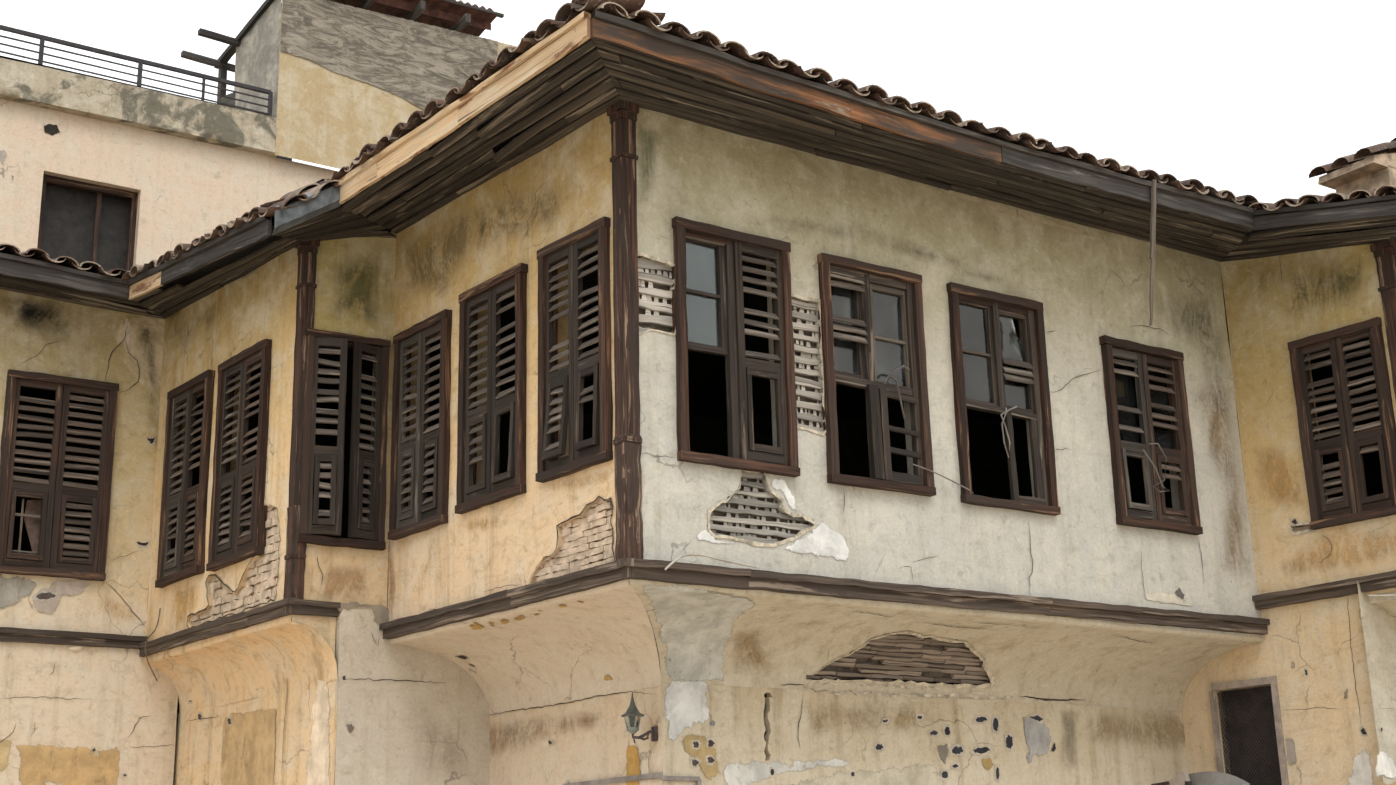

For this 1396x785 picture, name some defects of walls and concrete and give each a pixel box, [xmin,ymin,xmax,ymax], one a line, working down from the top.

spalling [186,505,281,628]
spalling [530,496,615,583]
spalling [697,470,850,561]
peeling [0,740,127,785]
peeling [221,709,276,785]
spalling [804,631,1015,783]
peeling [1348,726,1396,785]